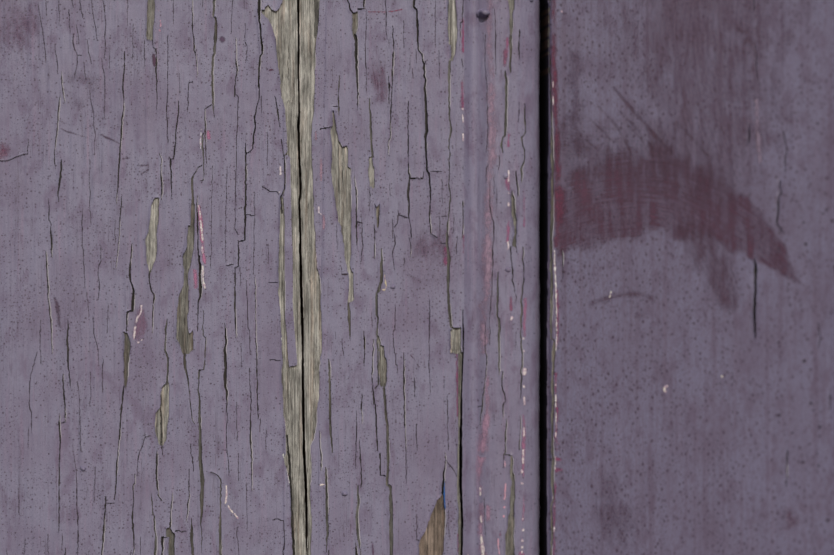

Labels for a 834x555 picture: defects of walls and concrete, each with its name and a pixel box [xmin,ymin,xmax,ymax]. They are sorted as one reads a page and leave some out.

peeling [146,0,161,40]
peeling [448,0,458,62]
peeling [145,197,160,273]
crack [28,0,294,555]
peeling [176,204,204,354]
peeling [261,0,324,555]
peeling [331,110,354,302]
crack [478,8,526,468]
crack [751,259,759,340]
peeling [450,327,469,555]
peeling [419,494,446,555]